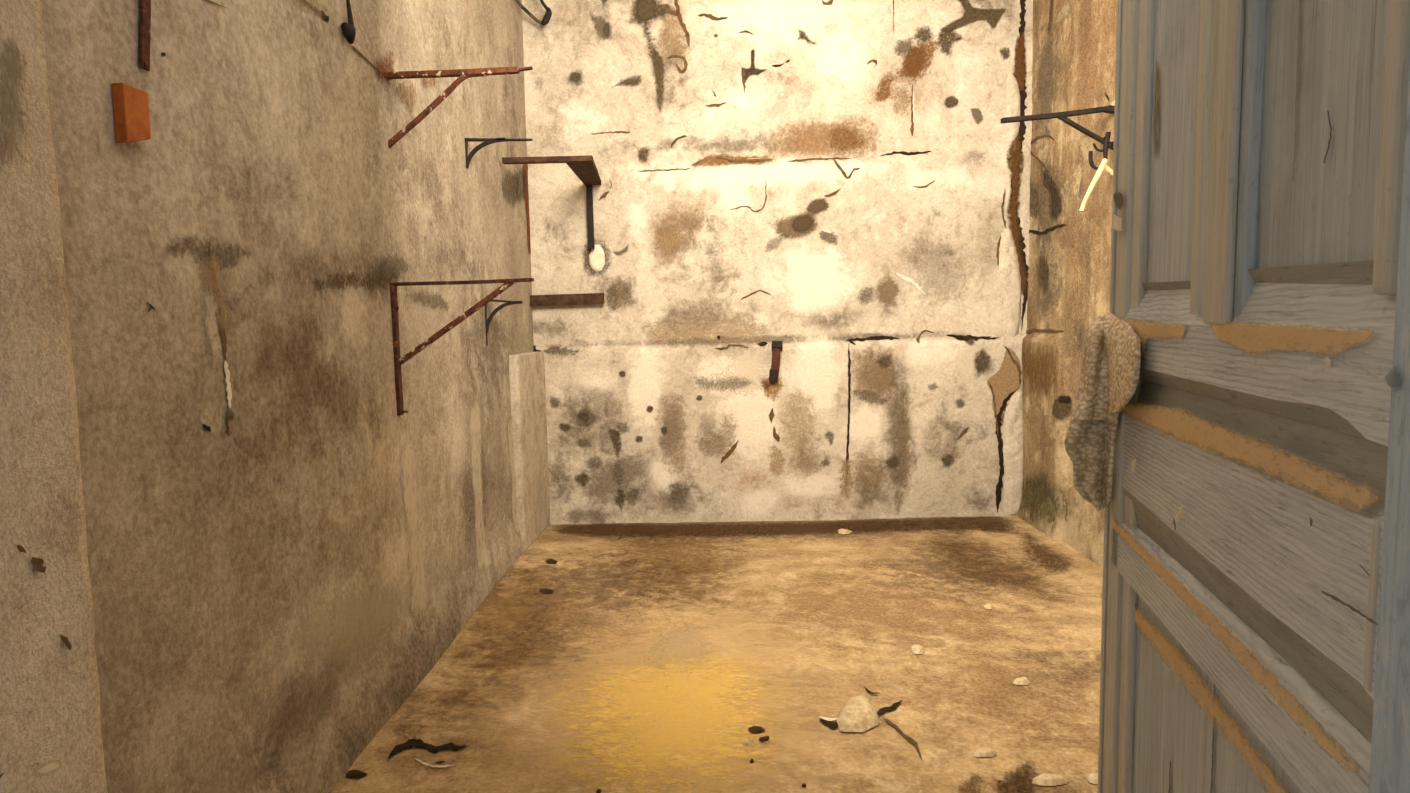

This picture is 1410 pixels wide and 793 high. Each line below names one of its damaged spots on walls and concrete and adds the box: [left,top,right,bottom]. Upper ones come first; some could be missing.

corrosion [877,40,939,113]
water stain [774,128,863,244]
crack [840,0,1066,513]
water stain [965,337,990,372]
flaking render [987,346,1022,435]
water stain [550,348,1072,572]
water stain [504,615,833,793]